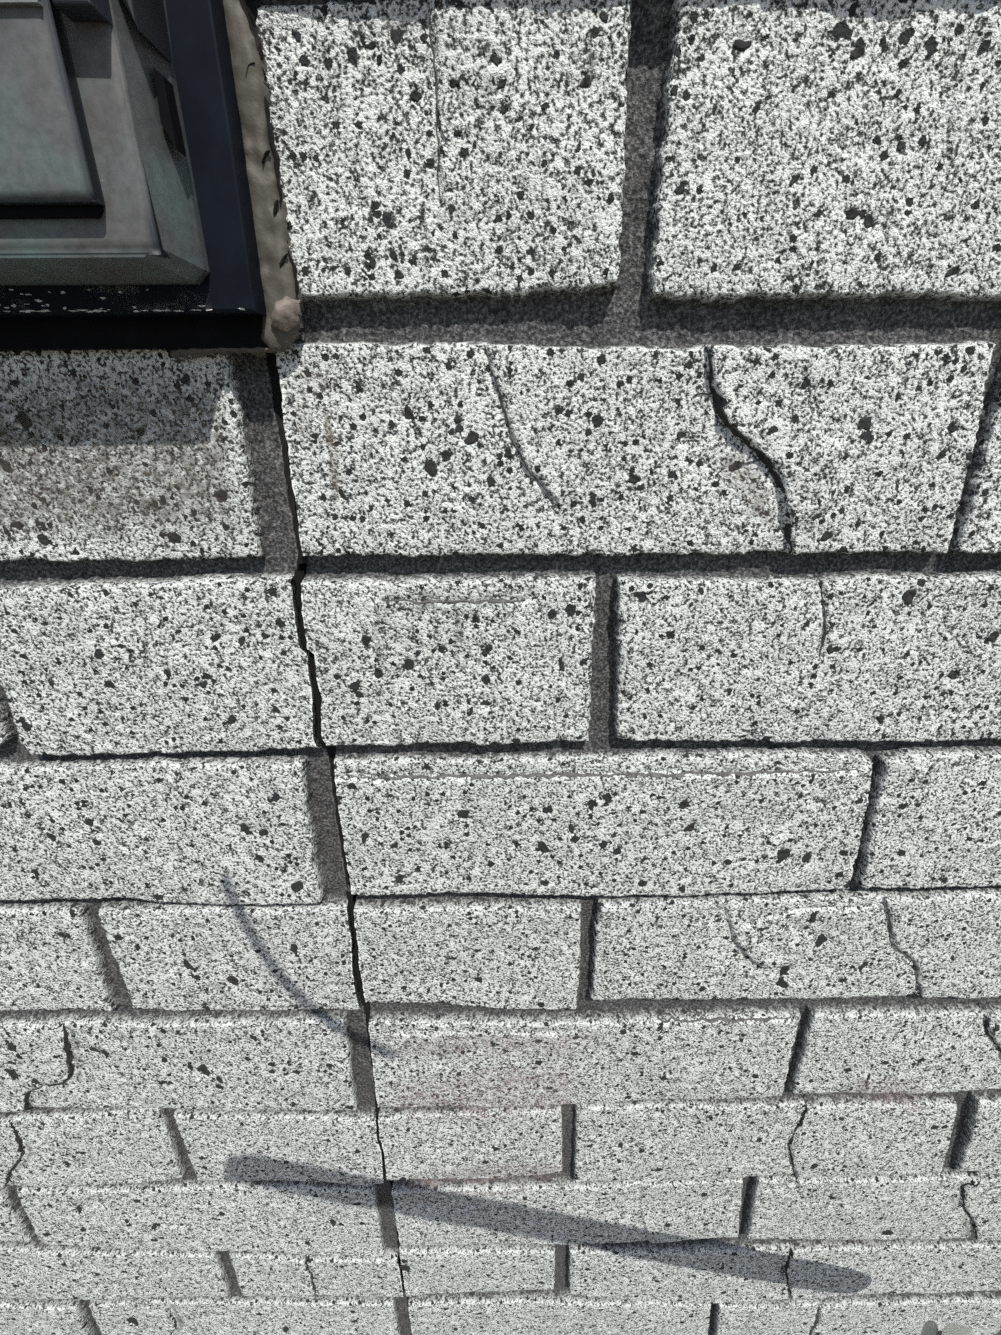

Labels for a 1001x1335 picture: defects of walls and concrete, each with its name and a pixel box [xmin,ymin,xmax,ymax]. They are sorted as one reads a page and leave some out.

crack [267,347,865,1303]
crack [885,900,922,998]
crack [978,1002,1001,1053]
crack [778,1240,820,1335]